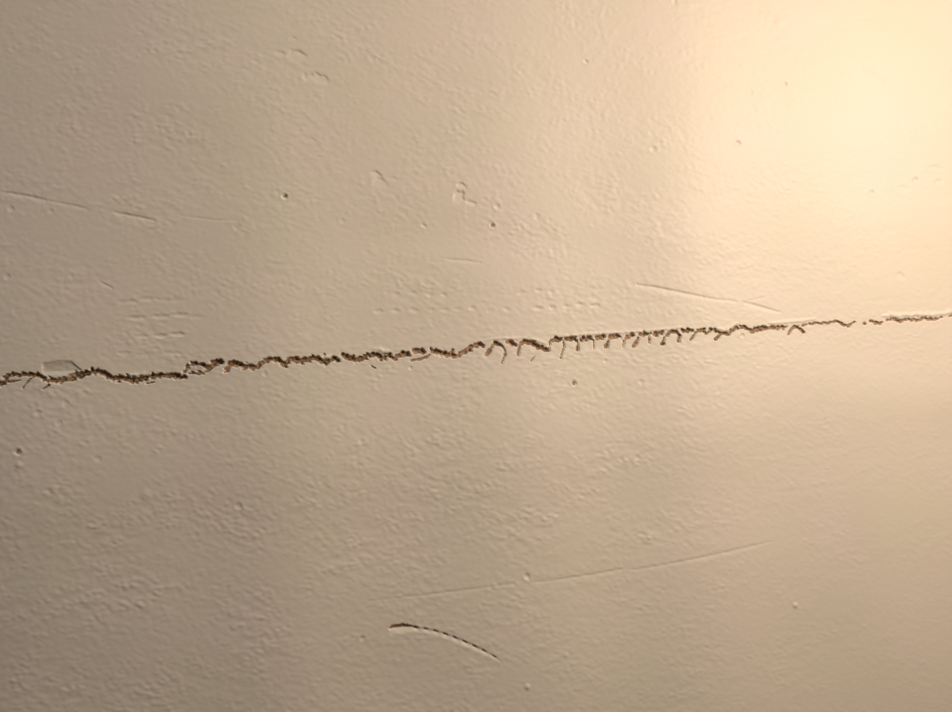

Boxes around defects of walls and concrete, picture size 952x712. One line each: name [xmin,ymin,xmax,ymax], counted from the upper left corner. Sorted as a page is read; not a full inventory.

crack [0,309,952,392]